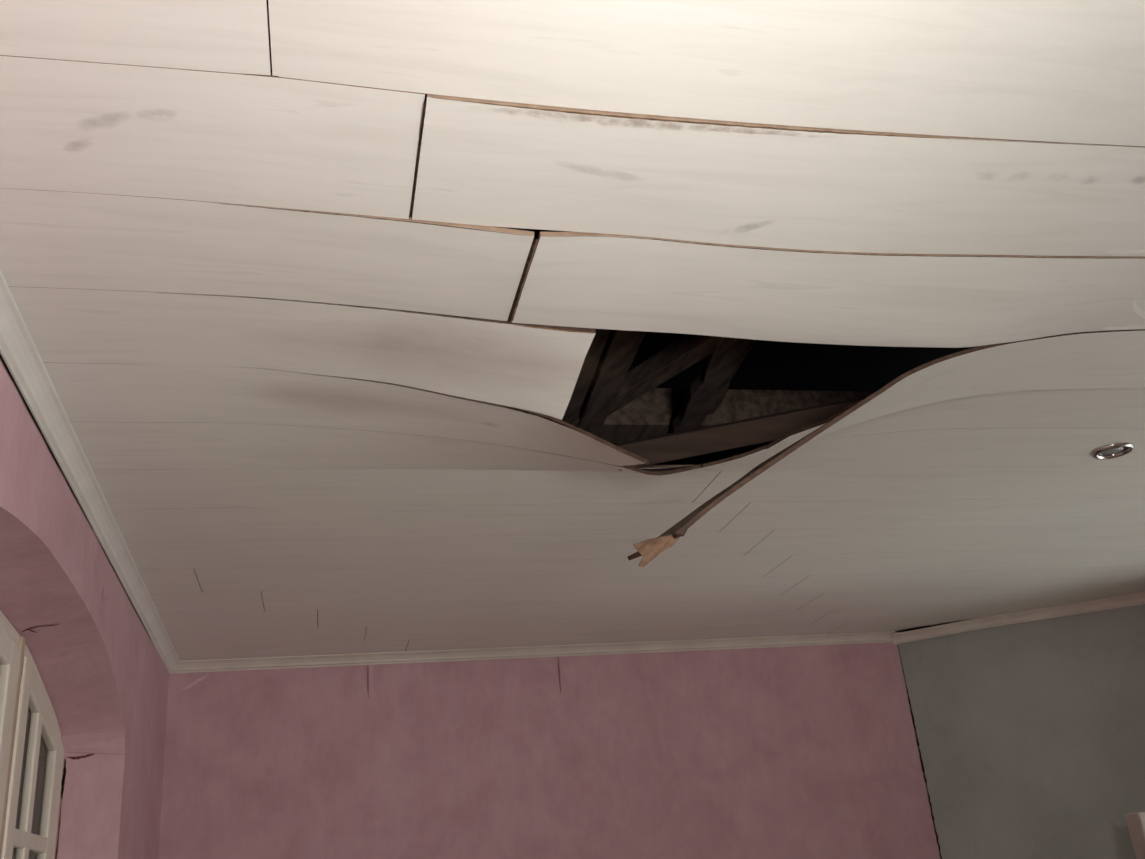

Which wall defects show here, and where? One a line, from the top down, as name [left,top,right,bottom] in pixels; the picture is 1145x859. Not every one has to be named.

crack [0,354,147,632]
peeling [632,534,679,567]
crack [55,754,94,859]